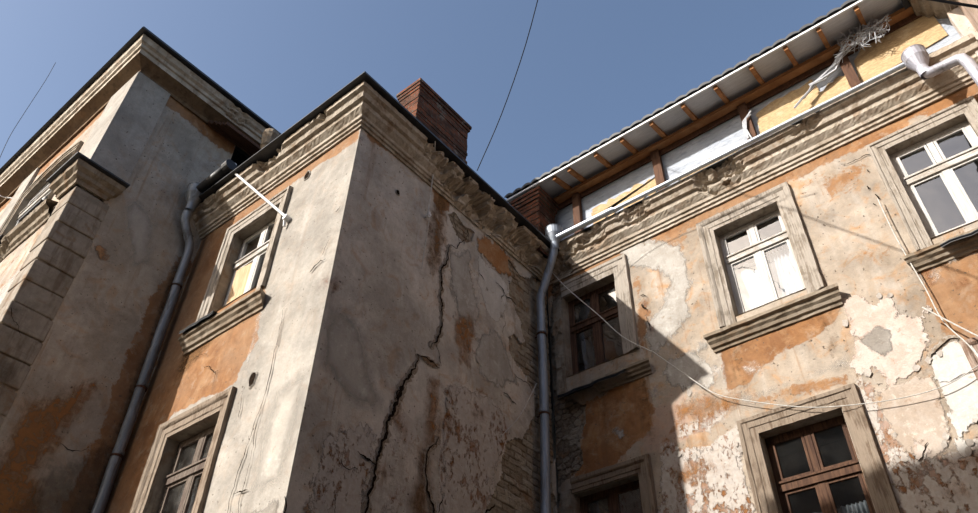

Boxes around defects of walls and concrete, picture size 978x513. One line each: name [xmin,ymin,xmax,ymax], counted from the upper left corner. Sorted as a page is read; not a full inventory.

leakage [0,383,96,513]
crack [341,206,469,513]
flaking render [440,213,556,513]
flaking render [620,238,693,354]
peeling [657,441,755,513]
peeling [841,293,978,513]